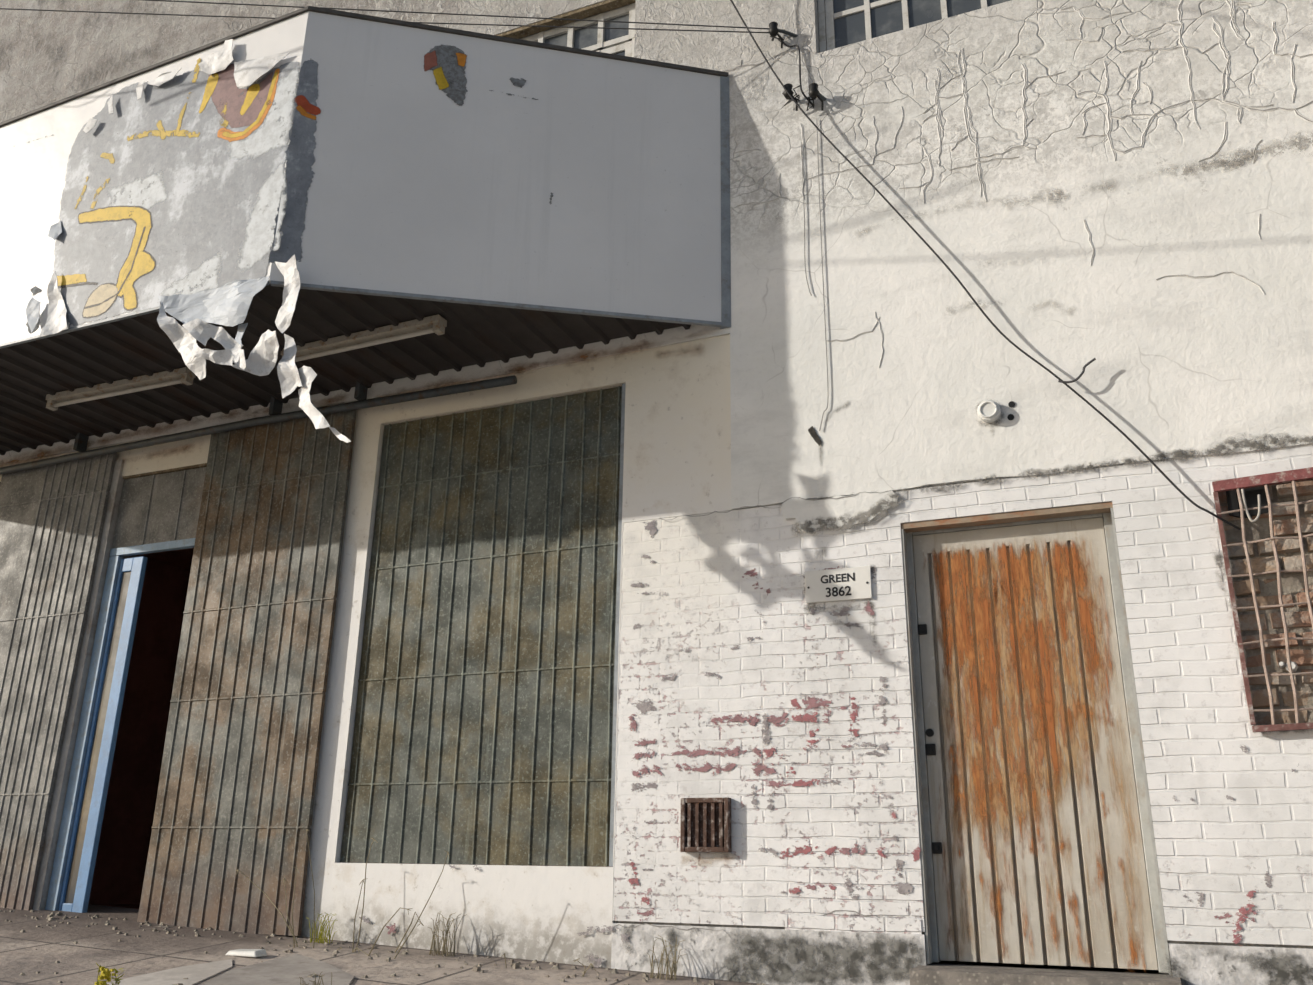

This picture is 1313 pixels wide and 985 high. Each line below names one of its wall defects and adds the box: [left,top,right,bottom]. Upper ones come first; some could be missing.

crack [734,0,1313,208]
crack [1083,220,1095,265]
crack [1156,271,1265,295]
crack [826,312,884,368]
damp [1027,435,1313,476]
peeling [810,601,874,629]
peeling [628,700,662,792]
peeling [671,676,921,895]
peeling [577,862,655,943]
peeling [774,878,876,900]
peeling [1214,871,1272,946]
damp [724,932,924,985]